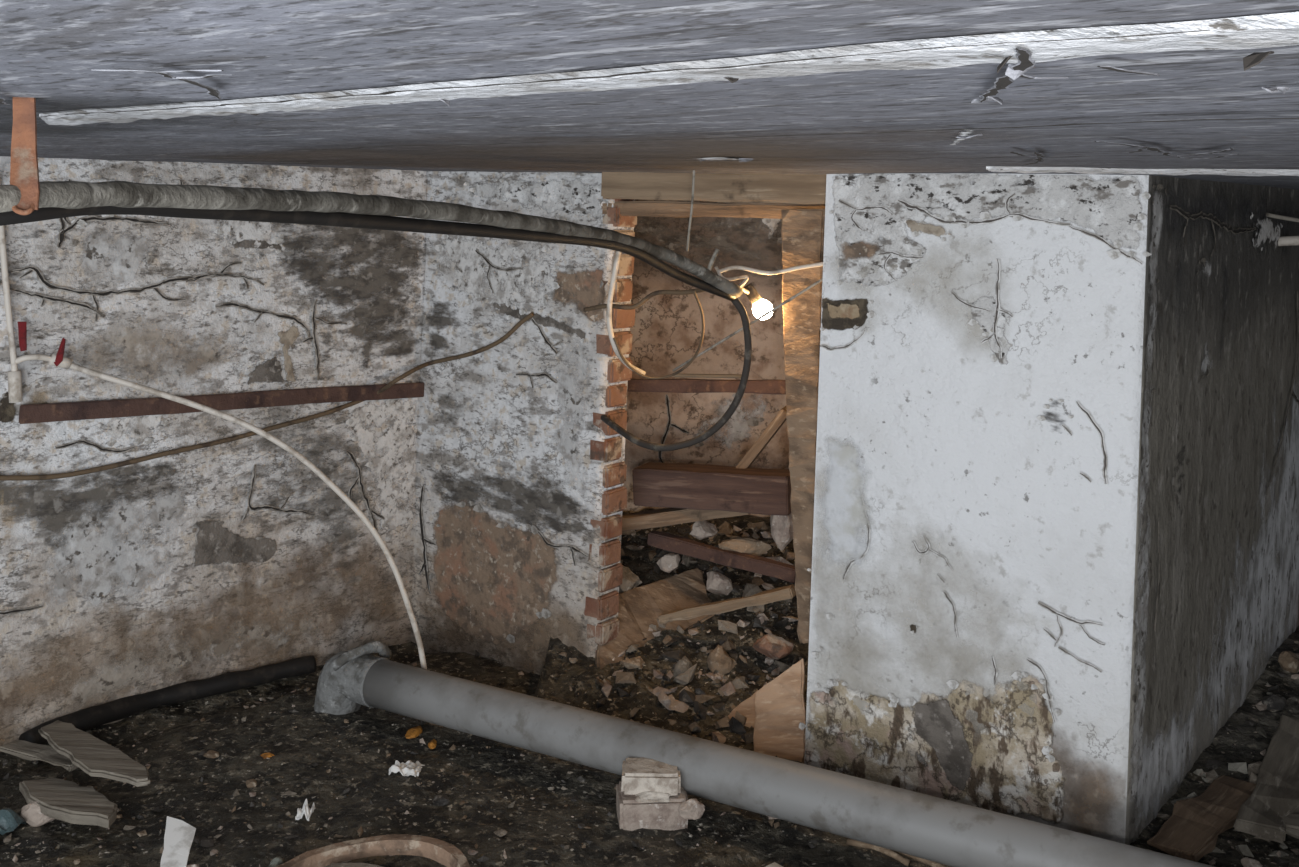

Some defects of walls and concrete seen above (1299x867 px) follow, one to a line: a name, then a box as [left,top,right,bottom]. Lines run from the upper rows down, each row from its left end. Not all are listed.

water stain [362,328,374,368]
peeling [346,399,416,539]
peeling [799,173,1192,824]
flaking render [429,501,557,645]